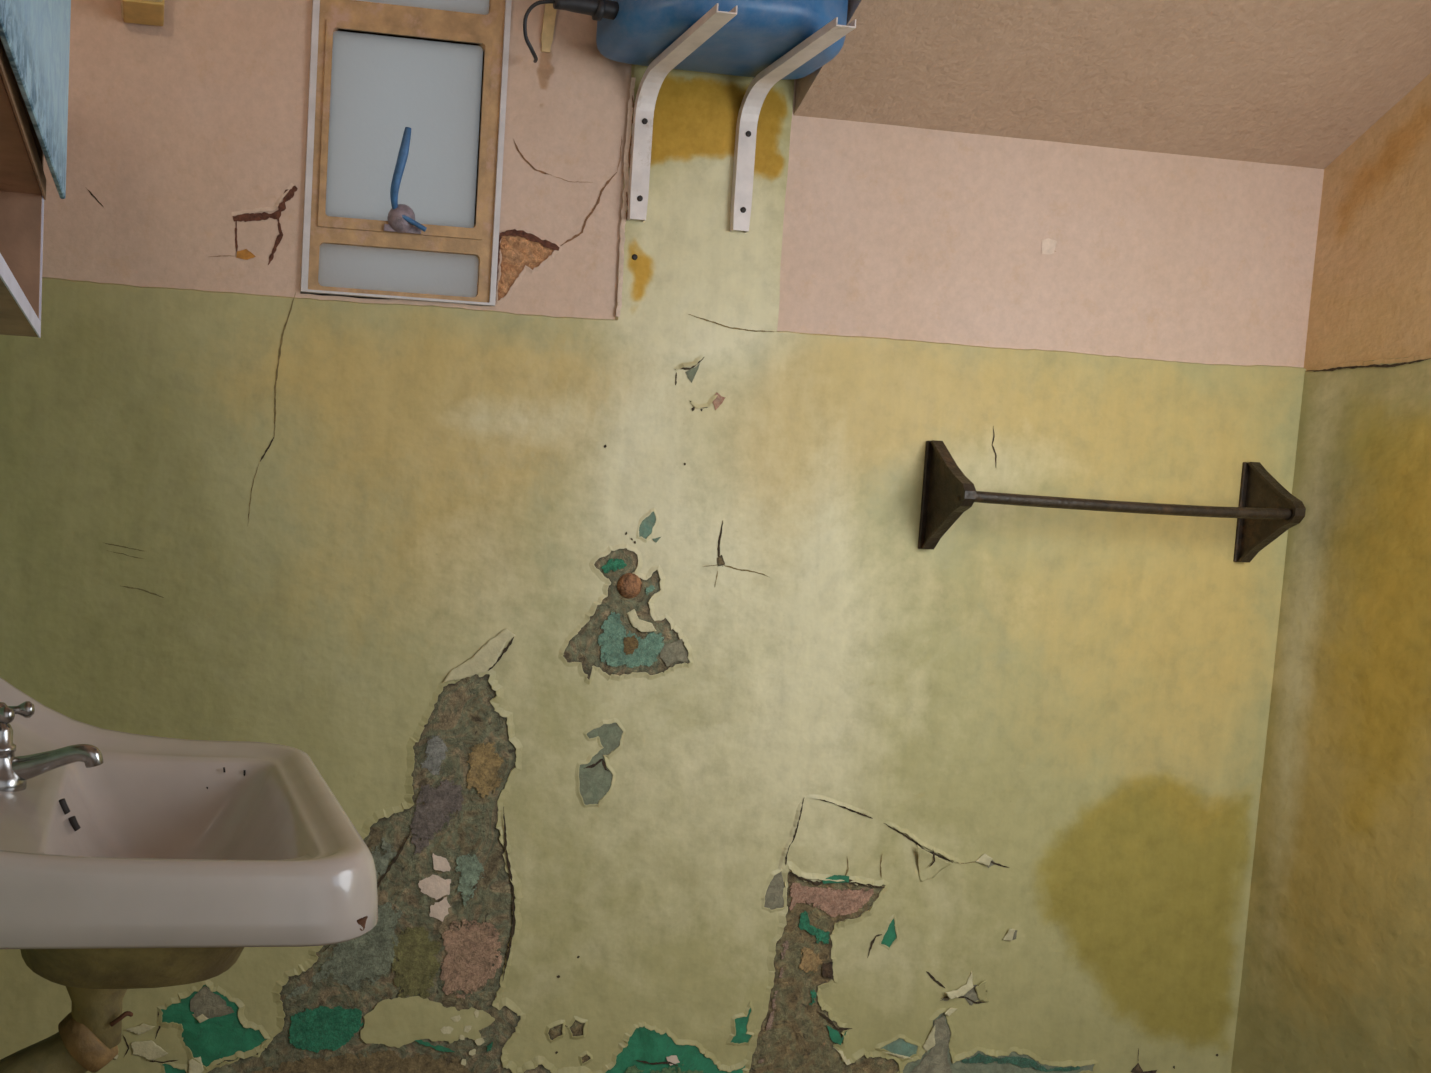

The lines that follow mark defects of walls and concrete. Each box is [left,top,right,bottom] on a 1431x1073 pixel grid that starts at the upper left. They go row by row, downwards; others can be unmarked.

crack [211,183,298,265]
crack [513,139,593,183]
crack [247,292,296,526]
peeling [558,508,694,685]
crack [703,521,768,585]
spalling [156,628,1098,1073]